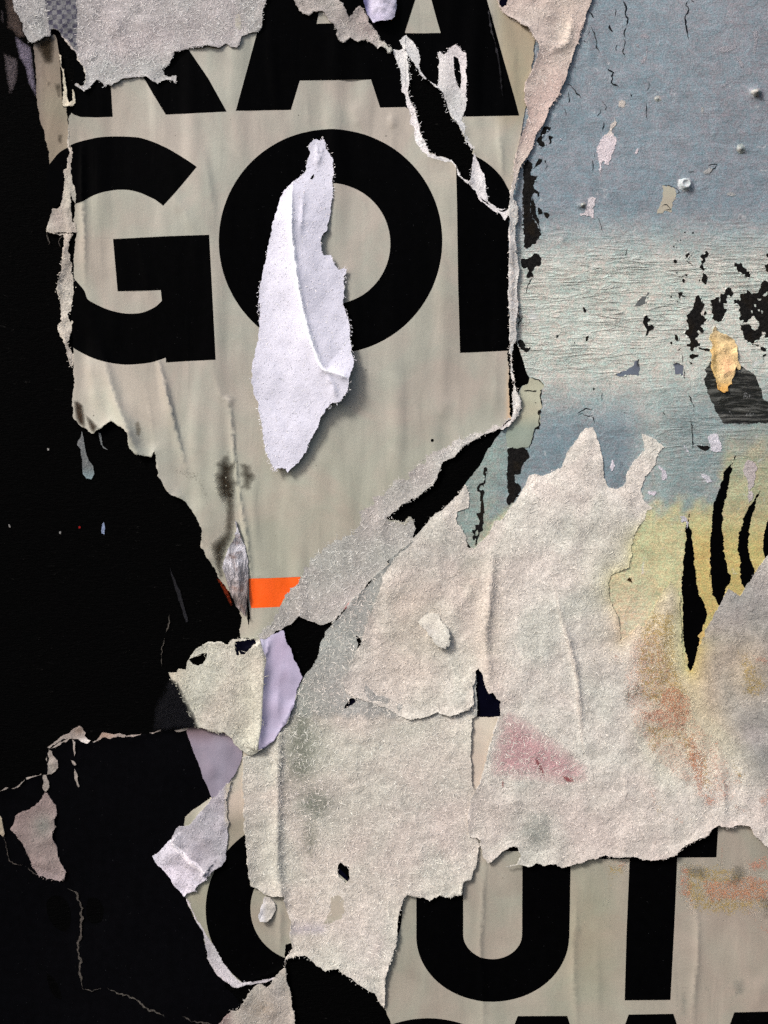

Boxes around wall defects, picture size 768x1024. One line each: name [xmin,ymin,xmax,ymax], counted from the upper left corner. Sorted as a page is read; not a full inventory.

peeling [521,126,553,278]
peeling [670,232,768,378]
peeling [470,467,487,545]
spalling [506,377,544,505]